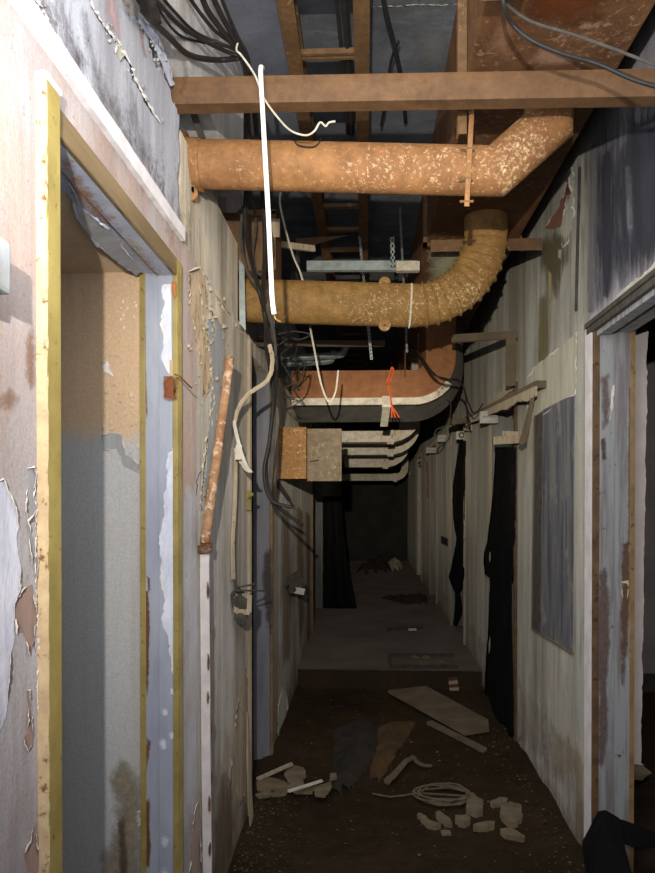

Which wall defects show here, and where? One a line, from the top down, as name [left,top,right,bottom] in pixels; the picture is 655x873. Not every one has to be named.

peeling [545,167,575,248]
peeling [160,284,172,373]
peeling [187,267,229,516]
peeling [0,466,39,730]
peeling [159,448,174,673]
peeling [23,689,34,752]
peeling [24,823,40,873]
water stain [105,763,141,873]